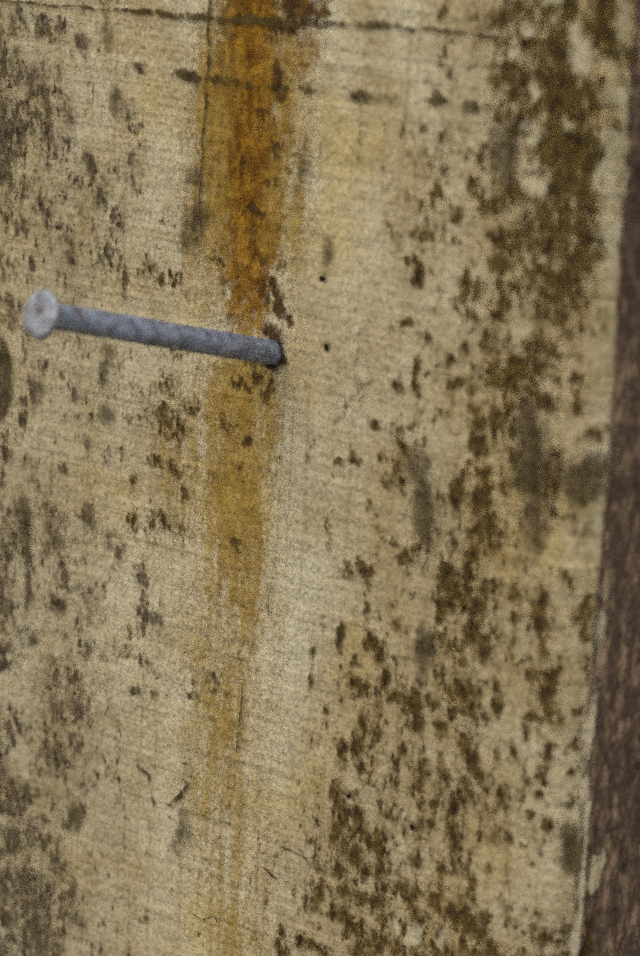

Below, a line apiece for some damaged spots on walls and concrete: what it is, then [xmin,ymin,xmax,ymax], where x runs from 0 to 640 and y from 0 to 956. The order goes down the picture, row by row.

crack [0,0,498,236]
corrosion [189,0,331,343]
corrosion [204,359,279,590]
leakage [309,0,638,956]
leakage [273,923,335,956]